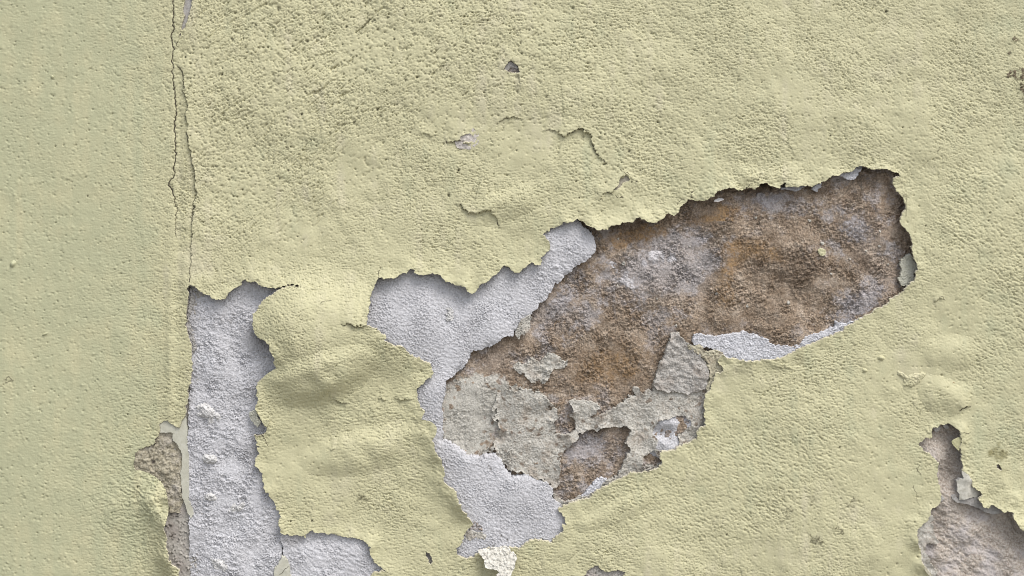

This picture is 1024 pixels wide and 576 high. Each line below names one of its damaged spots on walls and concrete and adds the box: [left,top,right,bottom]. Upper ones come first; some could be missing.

crack [168,1,197,282]
peeling [133,280,388,576]
spalling [367,166,918,576]
peeling [917,423,1024,576]